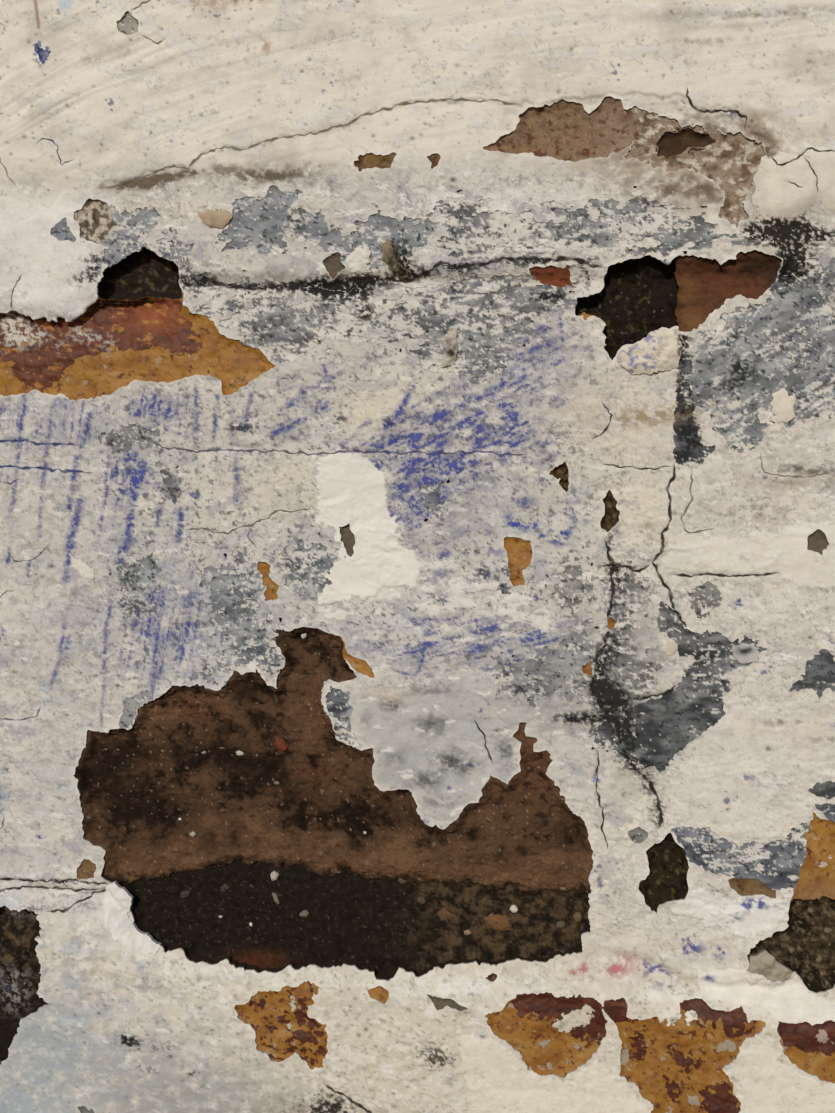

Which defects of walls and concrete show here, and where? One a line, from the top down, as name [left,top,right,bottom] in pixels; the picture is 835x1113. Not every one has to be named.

peeling [33,44,51,65]
crack [102,98,514,188]
crack [683,88,747,127]
peeling [0,97,835,466]
crack [595,404,613,438]
crack [760,455,831,478]
crack [590,464,774,847]
spalling [74,524,593,1003]
crack [0,878,106,913]
spalling [0,906,46,1060]
peeling [234,981,328,1069]
peeling [485,780,835,1113]